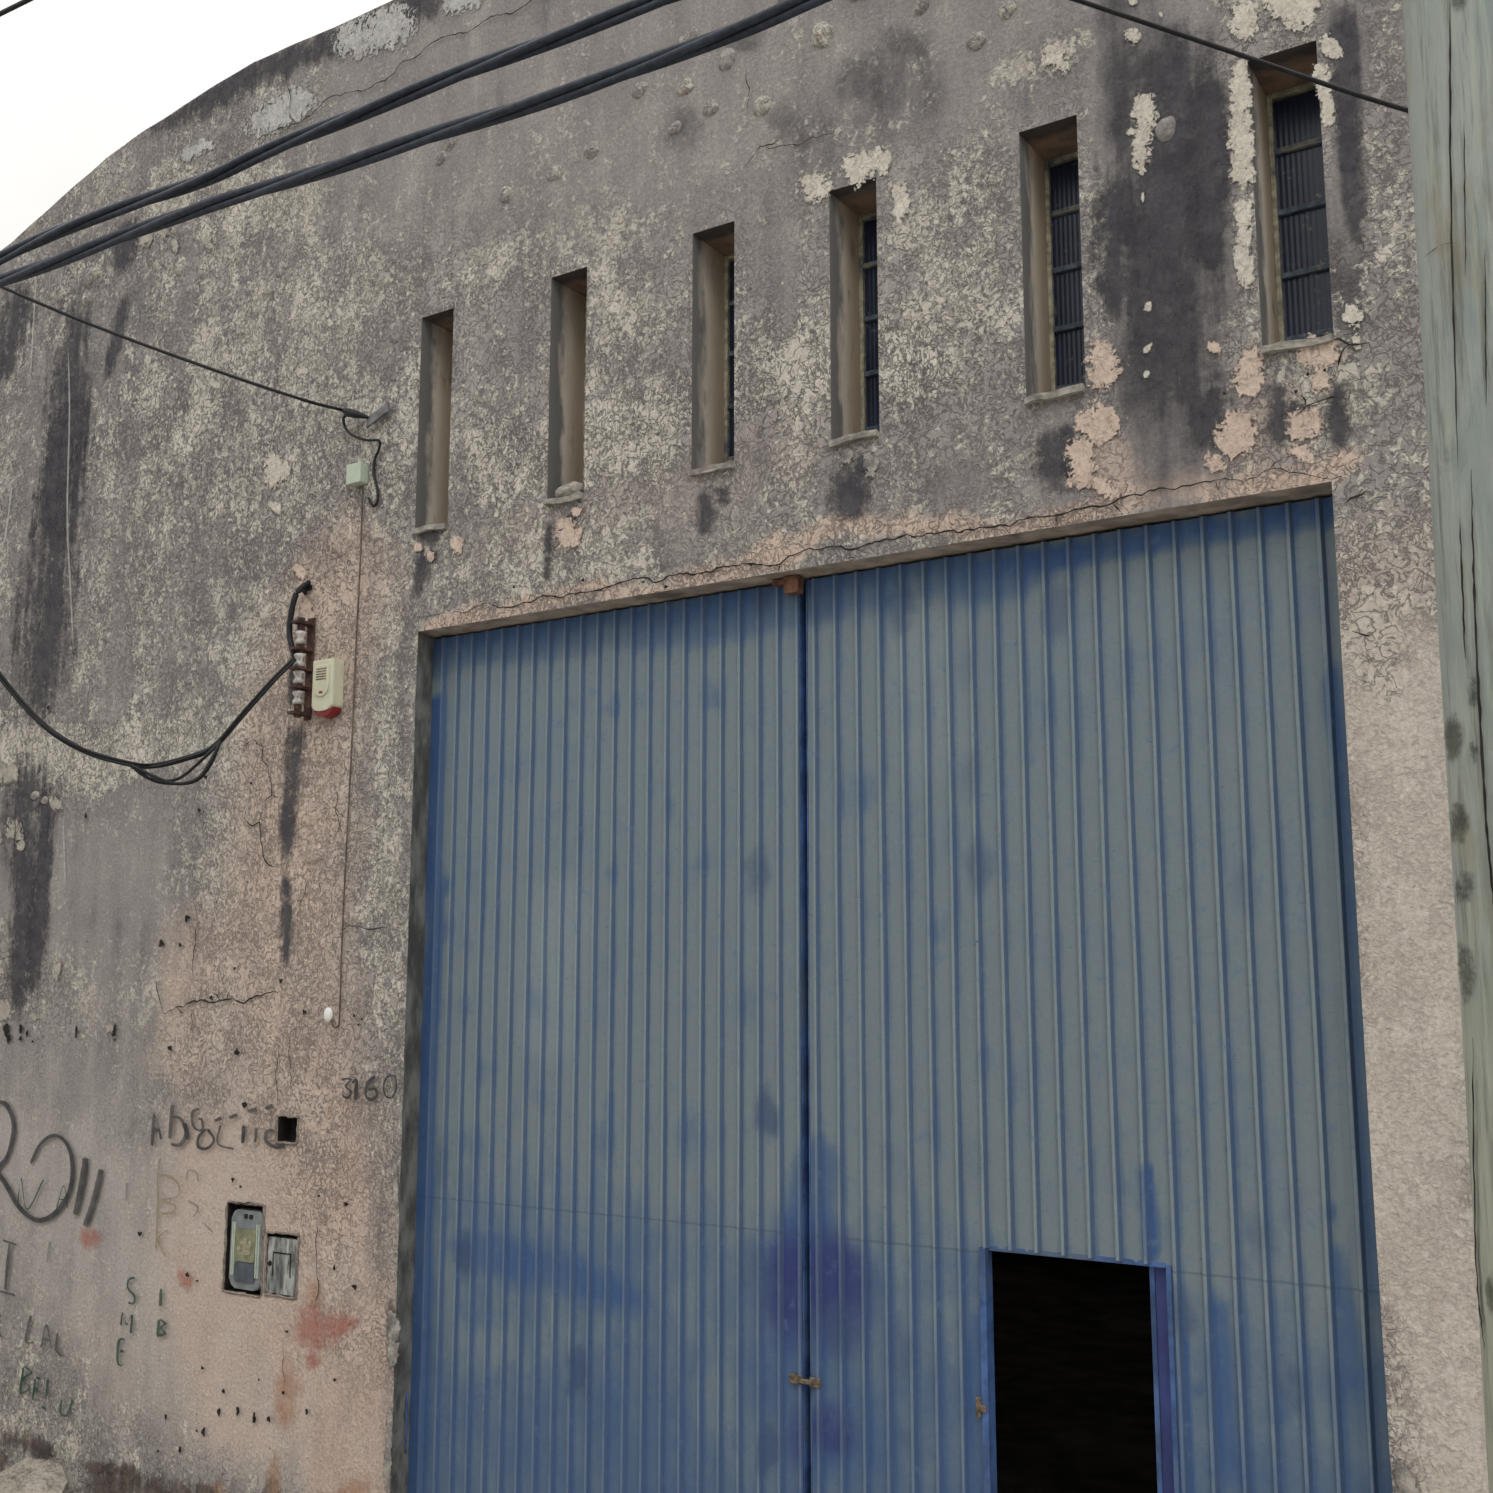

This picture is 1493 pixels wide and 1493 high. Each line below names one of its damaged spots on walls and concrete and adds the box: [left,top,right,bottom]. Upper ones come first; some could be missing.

peeling [1126,89,1160,202]
damp [1093,29,1231,448]
peeling [1225,0,1344,289]
damp [12,299,129,725]
crack [416,460,1366,621]
peeling [1063,335,1125,504]
peeling [1201,340,1266,474]
crack [1295,338,1370,416]
crack [1426,15,1493,903]
damp [1,755,66,1009]
damp [279,728,306,858]
crack [1472,1037,1485,1349]